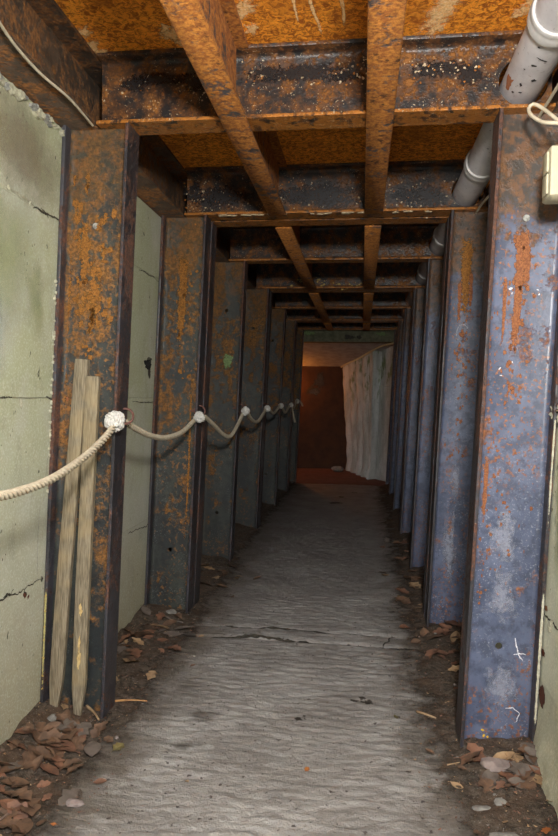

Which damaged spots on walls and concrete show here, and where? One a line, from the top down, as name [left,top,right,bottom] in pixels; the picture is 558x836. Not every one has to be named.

spalling [0,72,65,137]
crack [0,182,59,220]
rust [68,173,117,334]
crack [0,394,52,402]
rust [175,254,199,382]
rust [451,236,475,440]
rust [489,230,538,406]
crack [0,496,44,601]
rust [477,431,511,605]
crack [544,613,558,632]